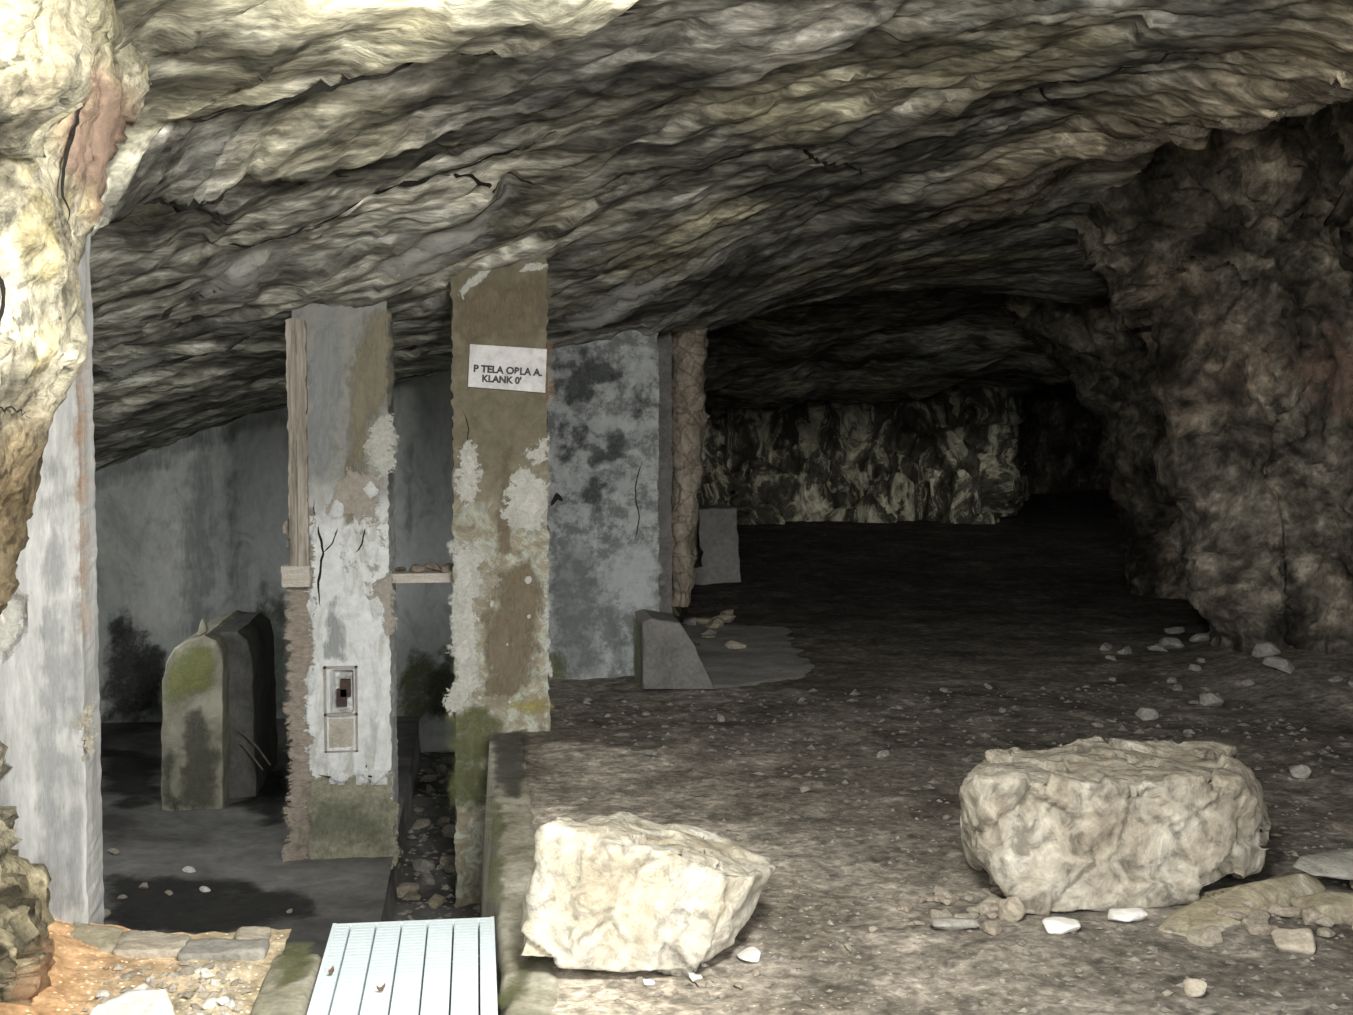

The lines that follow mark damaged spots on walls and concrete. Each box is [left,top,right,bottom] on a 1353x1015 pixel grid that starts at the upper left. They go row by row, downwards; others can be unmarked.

spalling [458,269,492,300]
spalling [519,262,548,272]
water stain [552,349,623,406]
flaking render [452,439,485,509]
flaking render [500,434,563,544]
water stain [559,423,624,506]
flaking render [281,413,403,869]
flaking render [442,539,516,717]
flaking render [524,559,553,677]